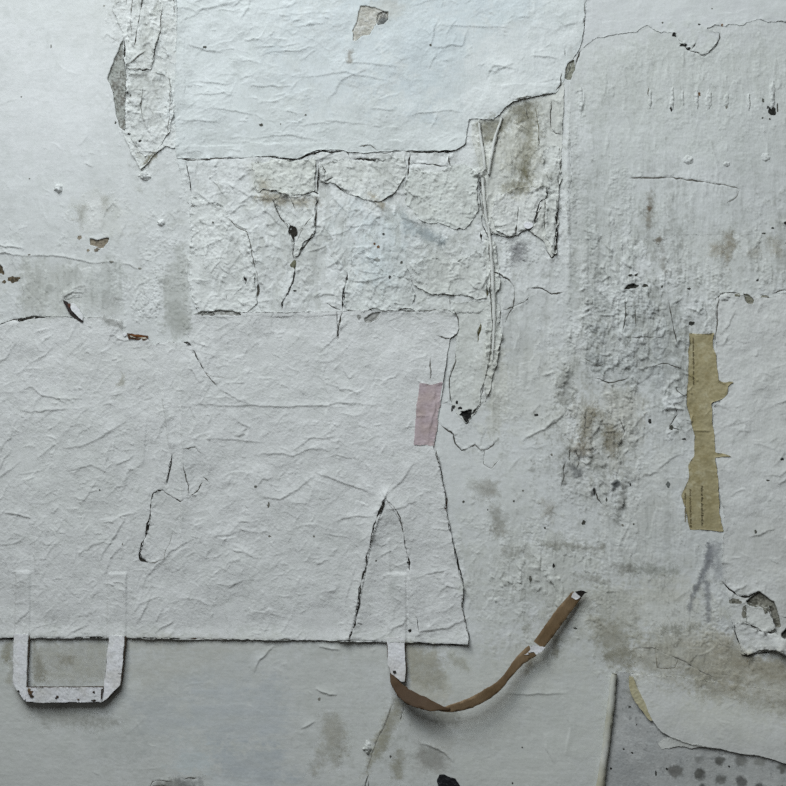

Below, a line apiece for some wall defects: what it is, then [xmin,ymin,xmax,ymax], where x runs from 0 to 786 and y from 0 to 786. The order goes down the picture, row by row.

peeling [107,0,177,169]
crack [183,145,451,311]
crack [327,274,348,337]
crack [409,299,459,400]
crack [472,127,562,413]
crack [440,424,497,468]
crack [413,451,470,646]
crack [280,636,386,644]
peeling [729,592,786,655]